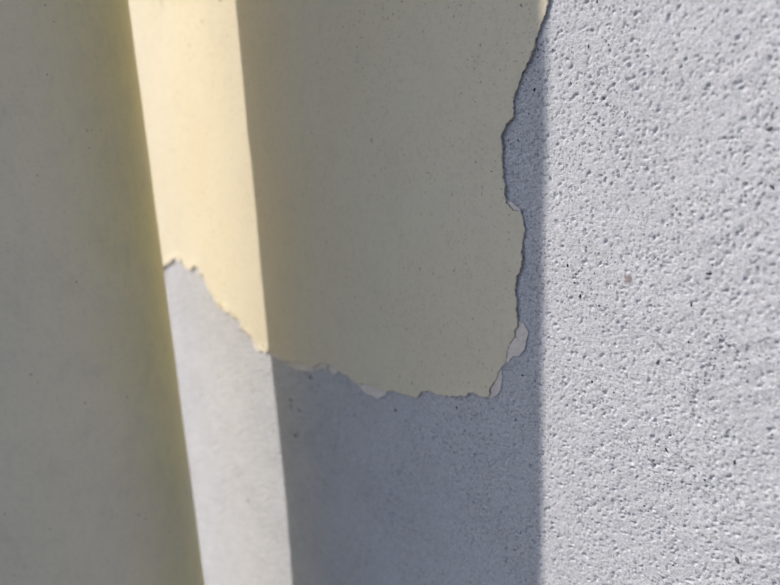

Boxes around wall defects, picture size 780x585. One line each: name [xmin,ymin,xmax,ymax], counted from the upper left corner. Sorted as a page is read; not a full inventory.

peeling [164,0,780,585]